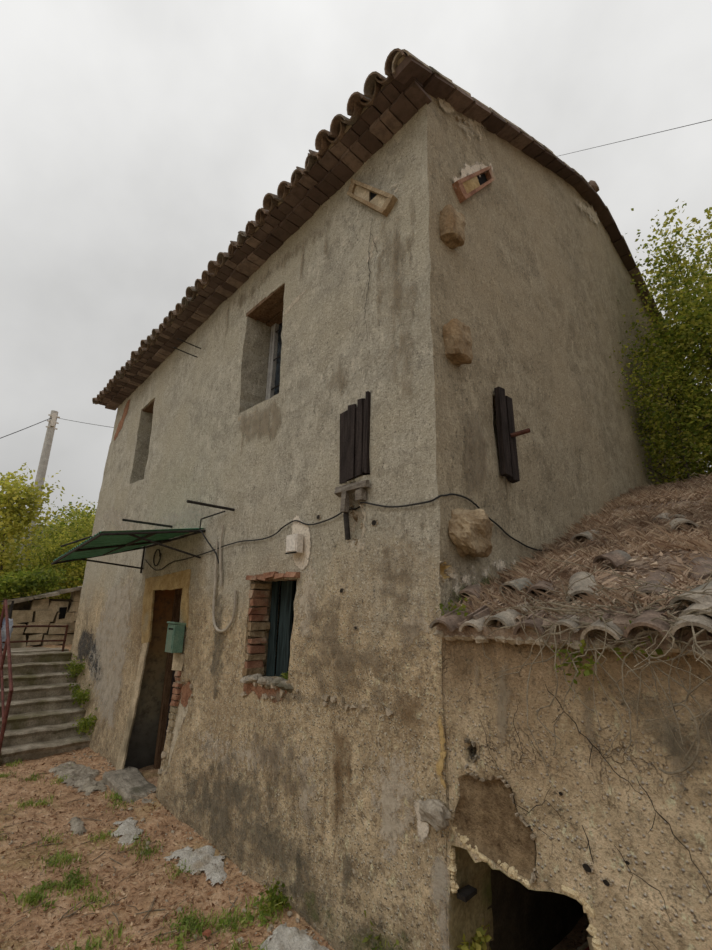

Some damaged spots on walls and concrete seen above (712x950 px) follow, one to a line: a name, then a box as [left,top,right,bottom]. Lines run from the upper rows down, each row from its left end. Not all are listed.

crack [361,219,377,341]
spalling [158,679,193,775]
damp [174,726,319,897]
damp [371,748,419,858]
peeling [447,757,536,893]
spalling [561,885,602,950]